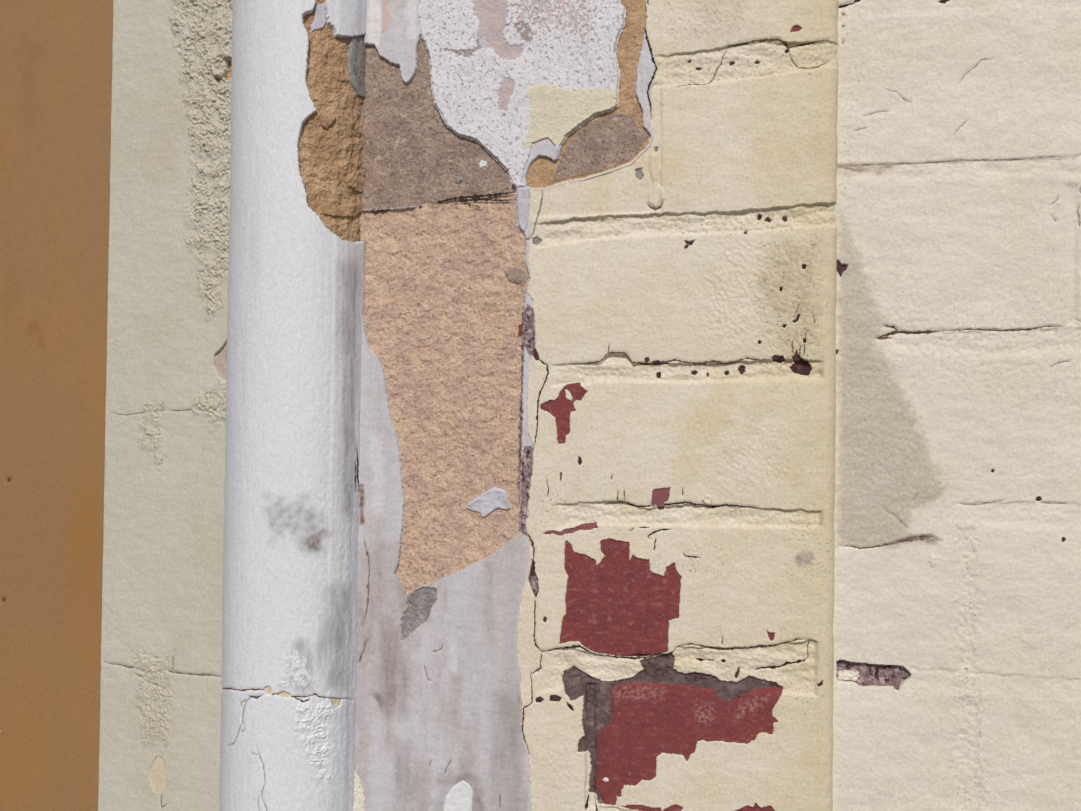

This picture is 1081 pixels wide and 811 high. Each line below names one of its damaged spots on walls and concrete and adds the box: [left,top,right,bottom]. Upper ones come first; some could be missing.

spalling [215,343,227,381]
spalling [298,0,658,640]
crack [574,303,815,365]
crack [534,360,549,445]
crack [603,476,754,549]
crack [525,532,535,559]
peeling [536,523,783,811]
crack [522,600,809,751]
spalling [836,660,910,690]
peeling [354,772,366,811]
peeling [444,780,473,811]